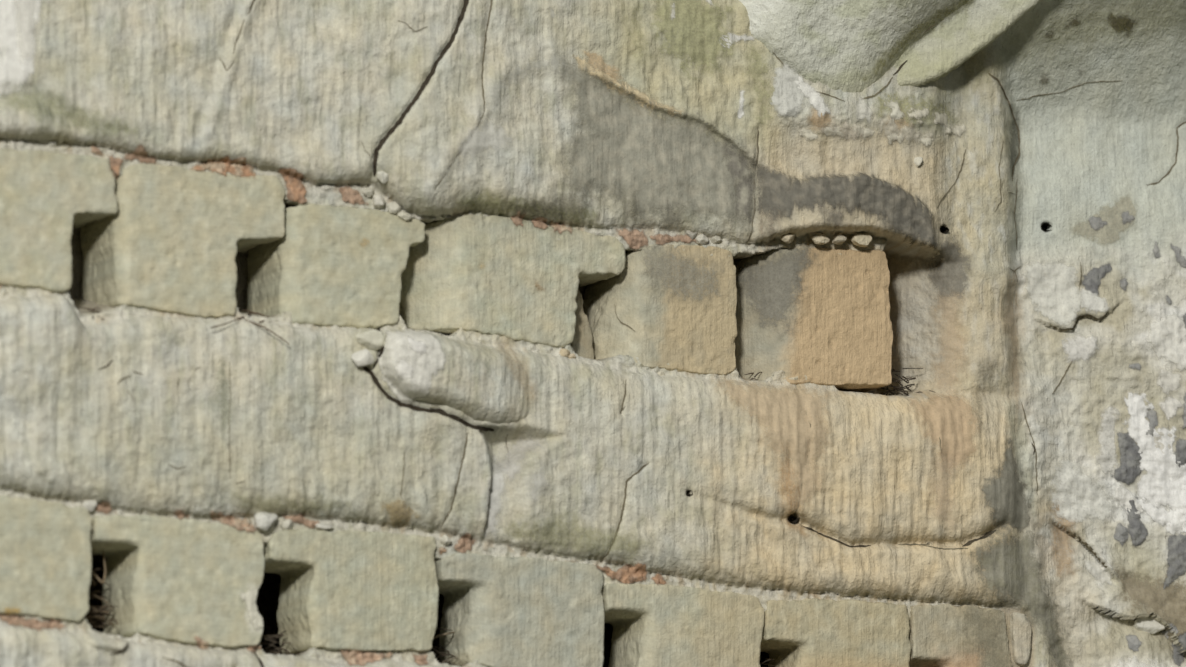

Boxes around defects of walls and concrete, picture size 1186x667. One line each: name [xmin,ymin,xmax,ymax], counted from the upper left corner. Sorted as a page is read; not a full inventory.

crack [362,0,492,188]
water stain [459,57,970,300]
crack [988,73,1122,282]
spalling [1024,260,1109,361]
spalling [1073,197,1136,244]
crack [1147,122,1186,185]
crack [364,328,509,531]
crack [602,463,649,559]
crack [795,423,996,549]
water stain [965,438,1070,667]
spalling [1051,314,1186,535]